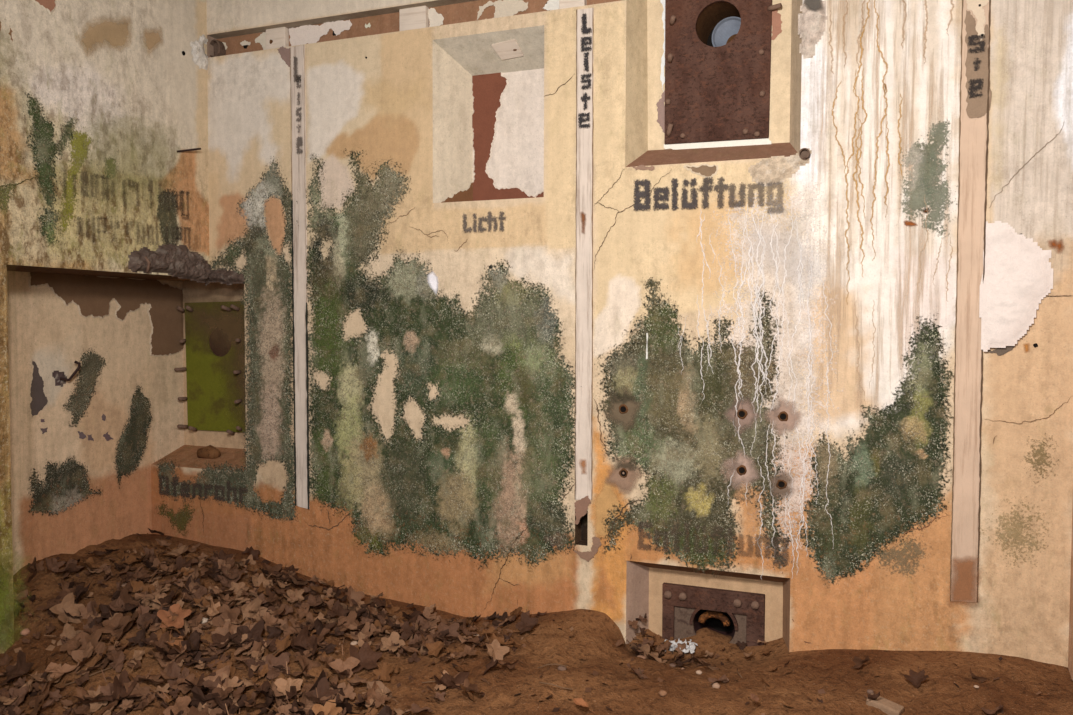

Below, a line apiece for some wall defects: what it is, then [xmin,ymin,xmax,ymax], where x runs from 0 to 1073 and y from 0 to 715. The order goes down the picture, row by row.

peeling [32,0,56,15]
peeling [428,8,444,27]
water stain [804,0,822,11]
peeling [441,72,544,203]
peeling [28,244,246,357]
water stain [428,272,438,292]
water stain [917,195,953,303]
water stain [678,190,834,575]